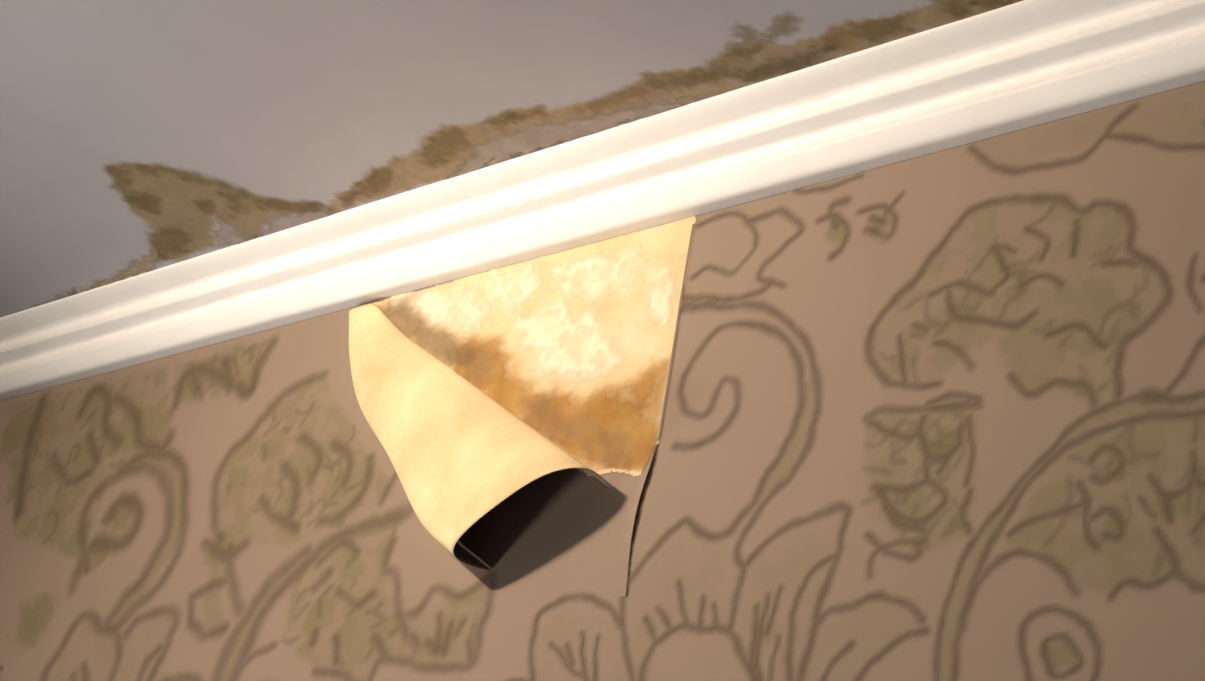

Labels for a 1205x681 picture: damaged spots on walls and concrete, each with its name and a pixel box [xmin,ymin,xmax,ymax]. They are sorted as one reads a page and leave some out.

water stain [70,0,1023,296]
flaking render [405,216,696,476]